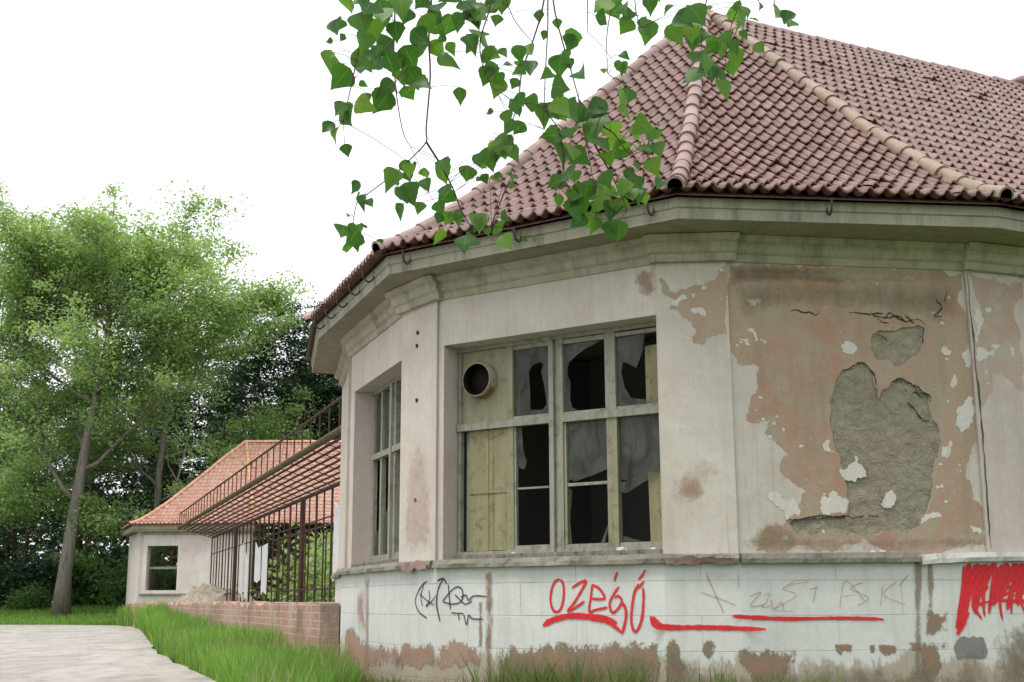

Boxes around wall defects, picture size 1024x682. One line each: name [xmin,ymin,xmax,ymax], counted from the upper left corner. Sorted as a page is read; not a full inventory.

water stain [638,272,652,293]
peeling [659,263,1024,555]
crack [842,276,991,543]
peeling [345,628,481,675]
peeling [499,640,684,682]
peeling [703,641,716,658]
peeling [739,649,795,682]
peeling [835,644,852,655]
peeling [870,645,896,656]